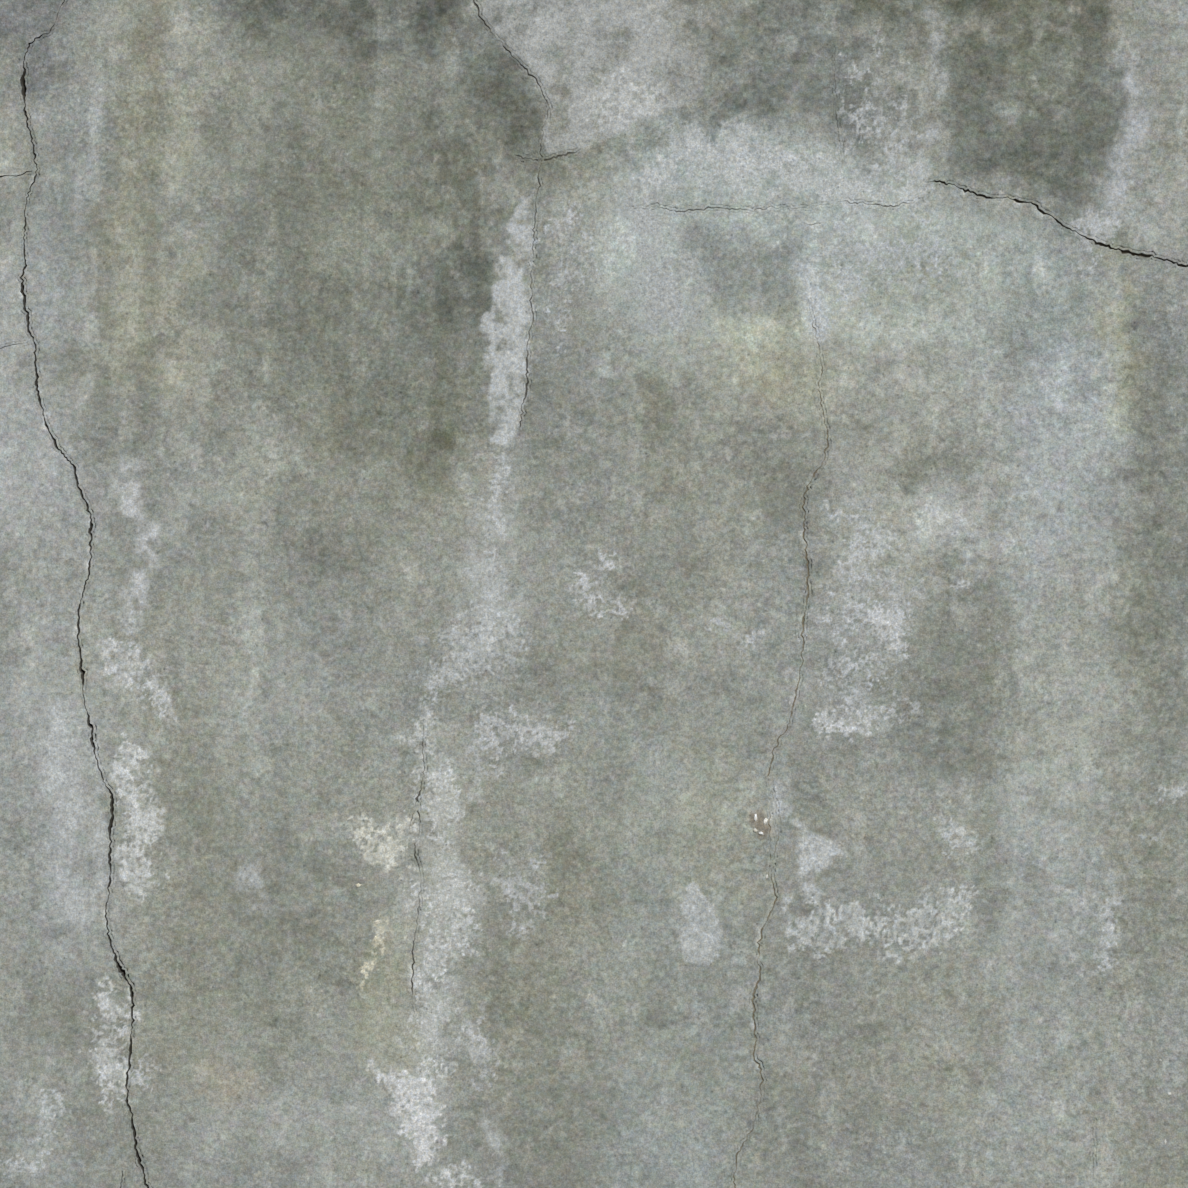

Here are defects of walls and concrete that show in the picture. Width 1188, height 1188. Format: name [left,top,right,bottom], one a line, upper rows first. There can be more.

damp [216,0,542,354]
crack [468,0,583,430]
damp [676,0,1134,229]
crack [625,177,1188,271]
crack [0,0,152,1188]
crack [405,722,427,1018]
efflorescence [325,413,590,1188]
crack [731,292,831,1188]